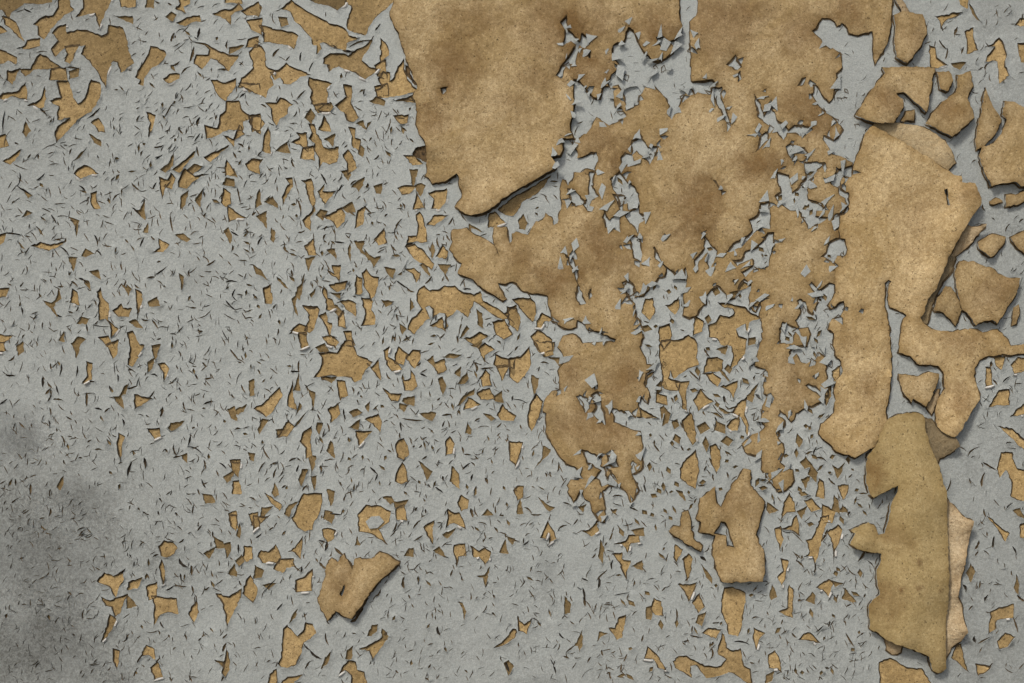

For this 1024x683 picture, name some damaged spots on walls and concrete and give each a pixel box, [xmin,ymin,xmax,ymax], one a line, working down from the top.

peeling [0,0,180,209]
peeling [159,148,203,209]
peeling [43,248,173,385]
peeling [254,373,316,444]
peeling [277,239,381,423]
peeling [382,334,421,412]
peeling [451,367,516,421]
peeling [216,422,338,626]
peeling [295,438,436,621]
peeling [424,466,524,586]
peeling [97,540,199,668]
peeling [339,615,396,683]